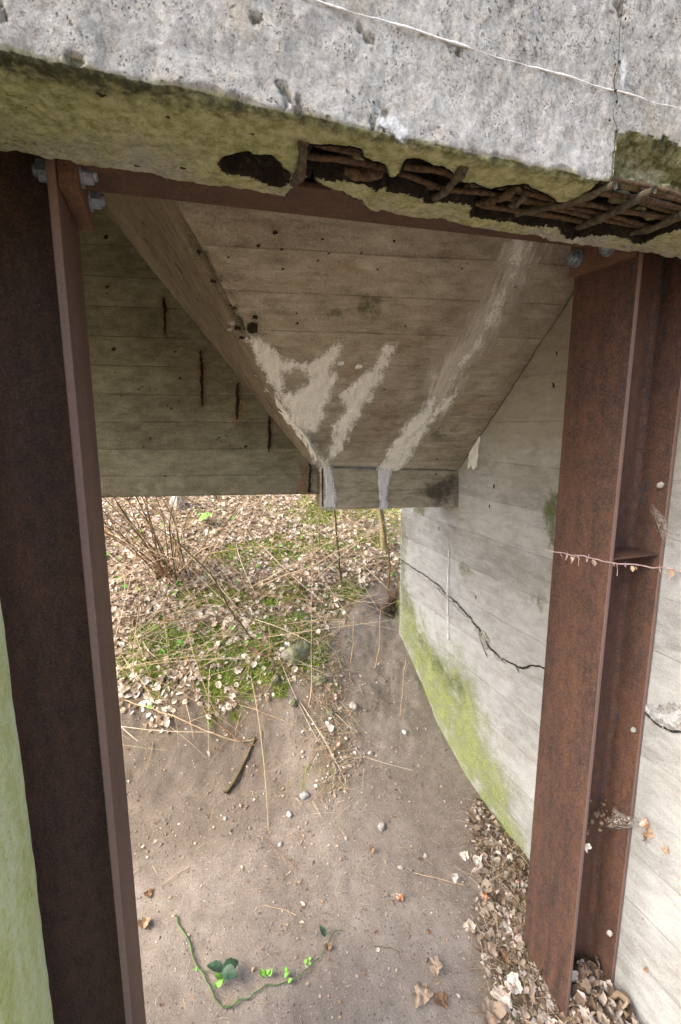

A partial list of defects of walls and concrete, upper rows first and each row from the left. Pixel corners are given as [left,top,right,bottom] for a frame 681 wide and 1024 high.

crack [608,2,626,133]
spalling [217,130,681,245]
rust [197,350,205,407]
water stain [246,336,395,508]
water stain [376,238,553,510]
crack [397,557,544,673]
crack [645,711,681,733]